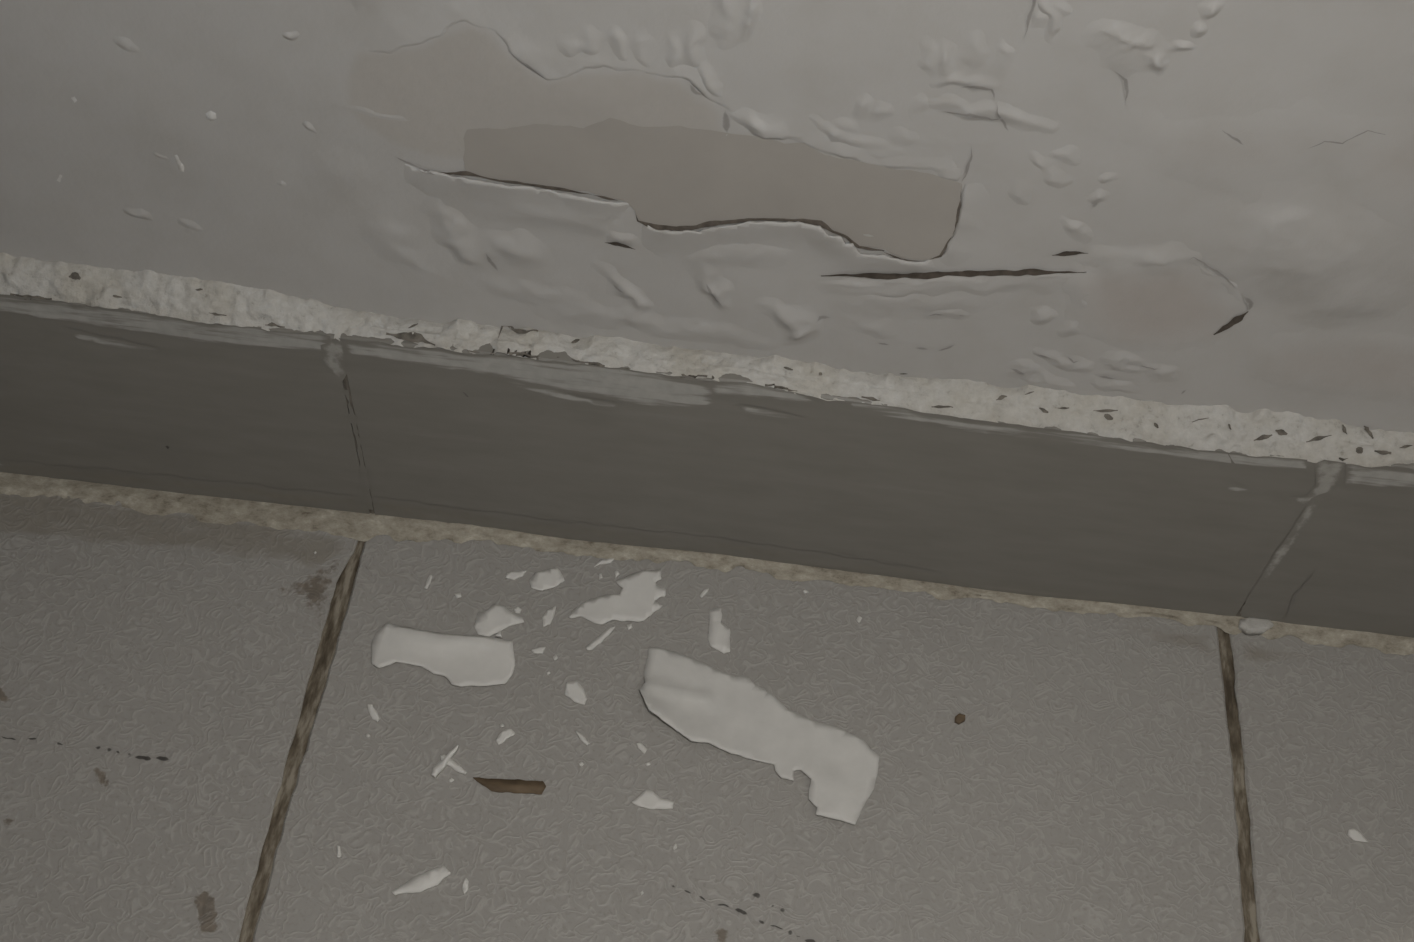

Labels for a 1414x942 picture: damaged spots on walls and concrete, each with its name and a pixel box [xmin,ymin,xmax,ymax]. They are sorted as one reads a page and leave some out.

crack [1024,0,1049,41]
crack [608,241,633,249]
peeling [0,0,1414,467]
damp [1062,261,1244,354]
damp [0,294,1346,617]